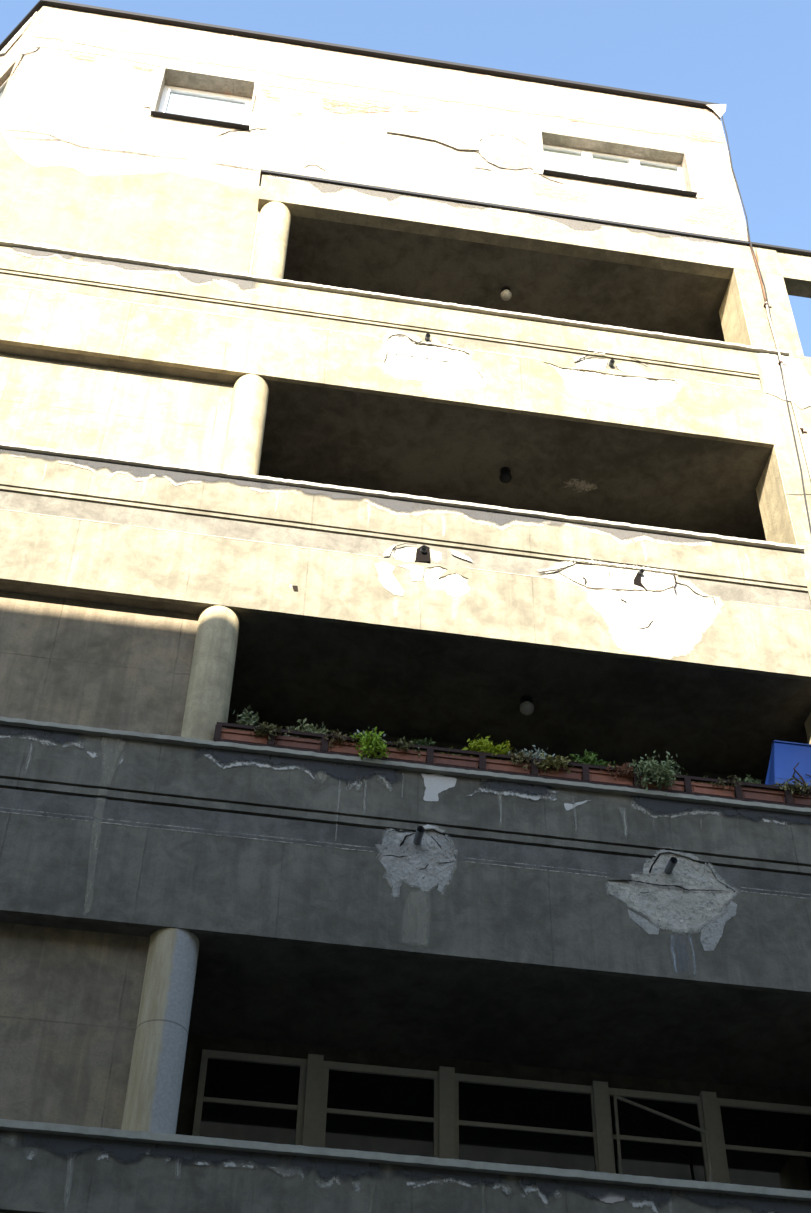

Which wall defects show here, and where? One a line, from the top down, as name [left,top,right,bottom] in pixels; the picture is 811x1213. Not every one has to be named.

peeling [32,7,725,152]
peeling [10,139,260,188]
spalling [383,330,487,392]
spalling [549,349,682,421]
spalling [757,353,811,410]
peeling [375,543,473,596]
spalling [539,558,723,659]
peeling [421,773,457,801]
spalling [375,824,457,945]
spalling [606,850,738,971]
peeling [597,1194,626,1203]